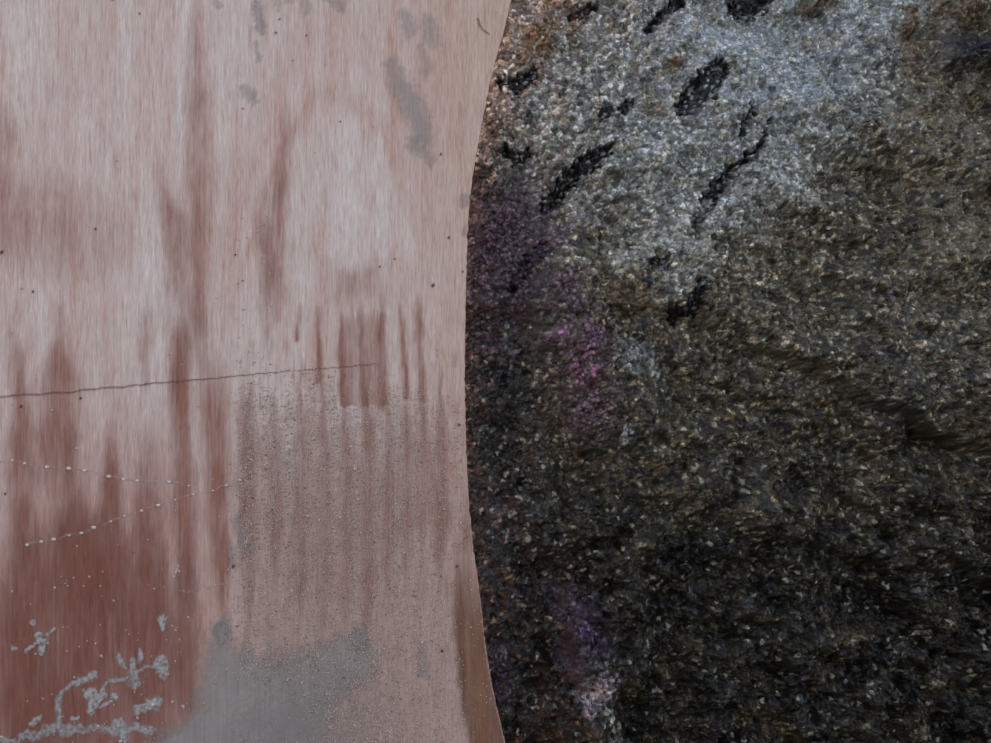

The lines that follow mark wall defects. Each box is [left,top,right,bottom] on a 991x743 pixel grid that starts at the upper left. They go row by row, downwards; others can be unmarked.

water stain [176,360,190,585]
water stain [211,458,224,513]
water stain [7,515,165,743]